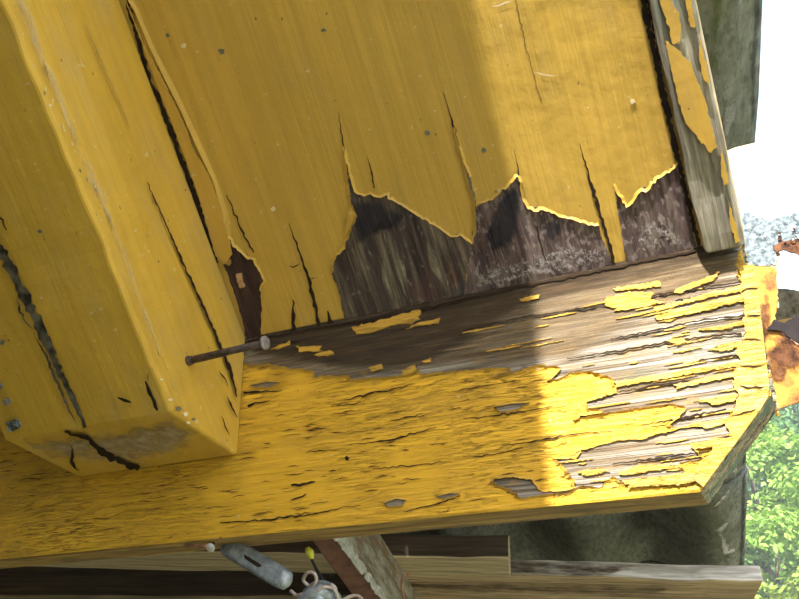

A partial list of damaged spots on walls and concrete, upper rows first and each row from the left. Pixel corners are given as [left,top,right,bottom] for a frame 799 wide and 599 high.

crack [126,0,218,263]
peeling [243,0,799,500]
rust [742,209,799,265]
crack [0,217,141,471]
rust [761,295,799,380]
crack [118,376,158,411]
peeling [382,497,407,509]